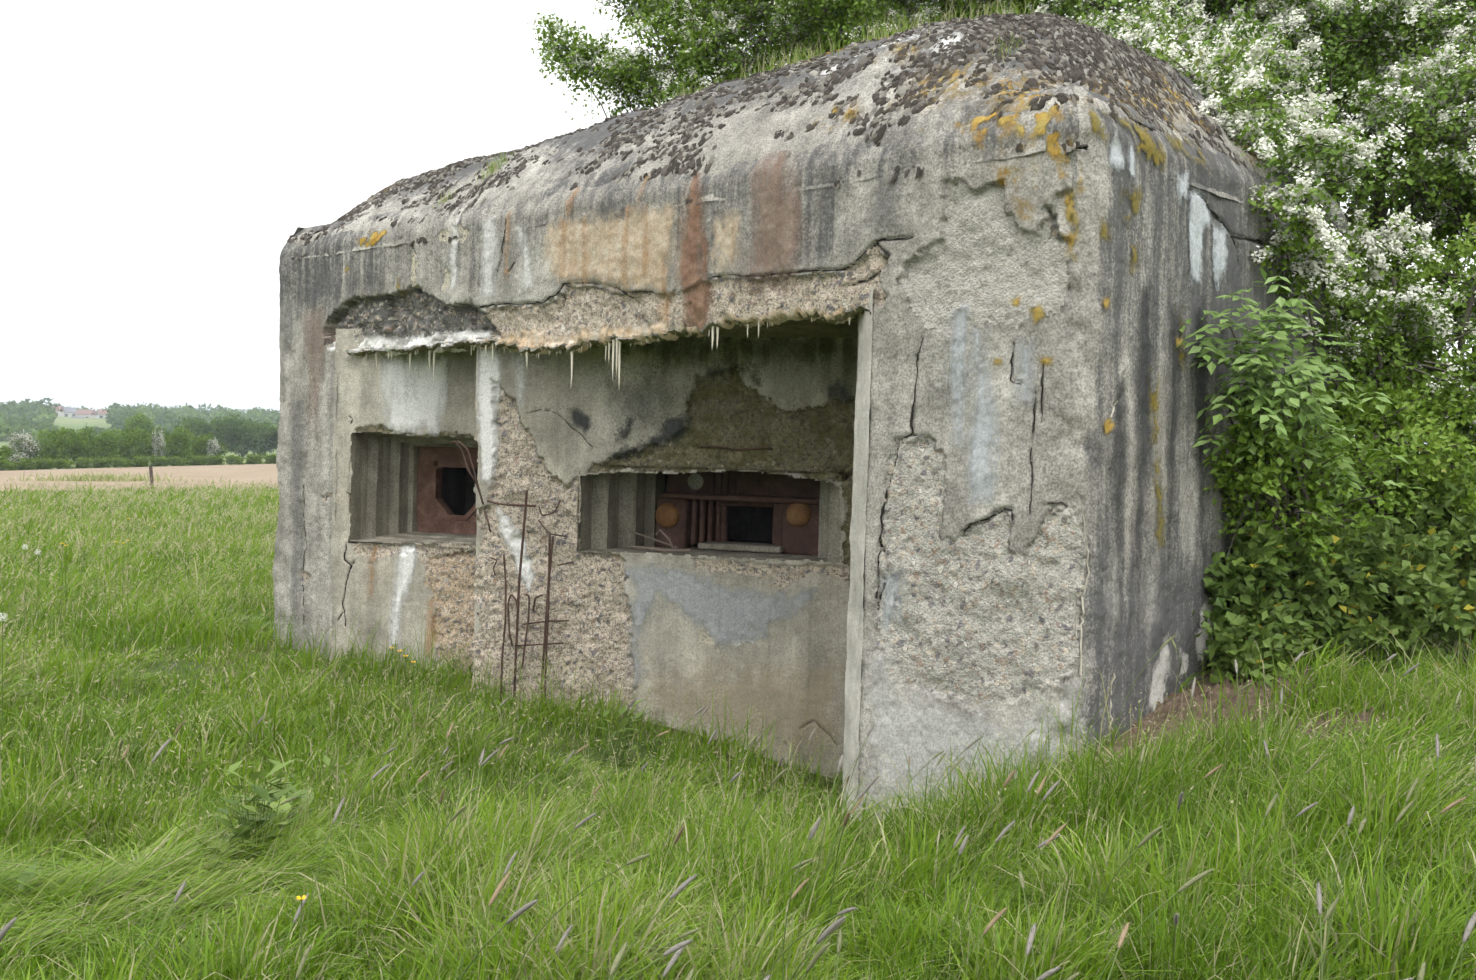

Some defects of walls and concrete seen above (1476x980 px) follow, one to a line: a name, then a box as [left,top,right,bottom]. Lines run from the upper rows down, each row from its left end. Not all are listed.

corrosion [662,173,710,330]
peeling [323,179,1075,349]
leakage [1109,132,1135,175]
leakage [1177,173,1228,287]
spalling [351,365,855,710]
spalling [874,435,1086,708]
leakage [1110,285,1238,630]